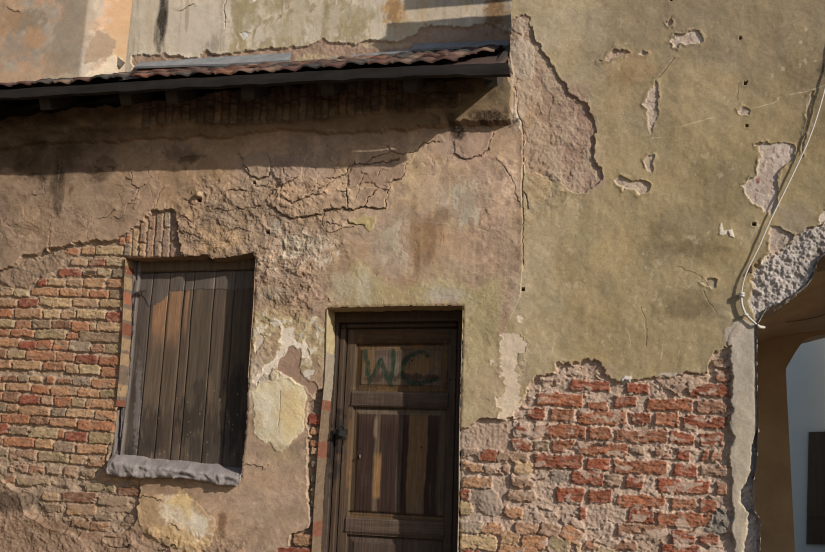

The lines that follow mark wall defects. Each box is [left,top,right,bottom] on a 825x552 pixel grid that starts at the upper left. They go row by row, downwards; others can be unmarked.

damp [157,0,168,51]
peeling [665,16,704,49]
crack [99,172,165,221]
spalling [83,13,604,193]
crack [176,86,529,264]
peeling [614,154,655,195]
peeling [642,80,660,134]
peeling [741,90,815,215]
spalling [748,209,825,322]
spalling [0,208,184,552]
spalling [252,325,325,552]
spalling [459,313,760,552]